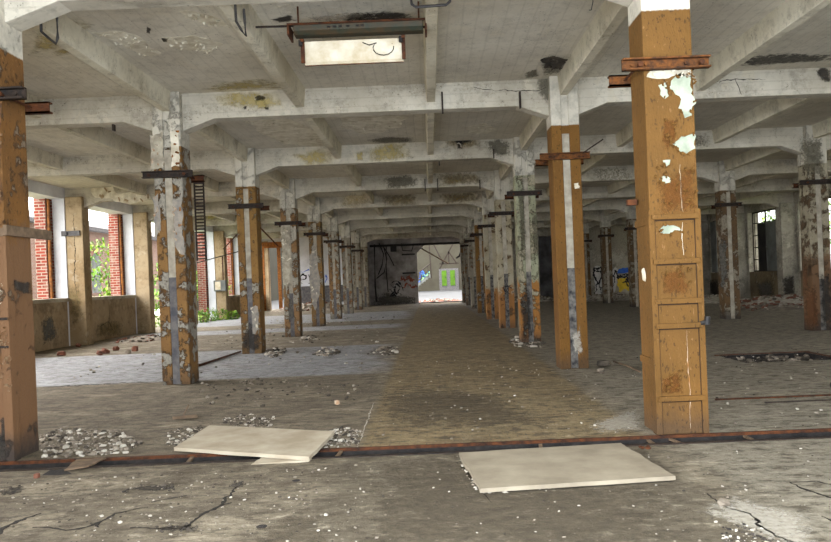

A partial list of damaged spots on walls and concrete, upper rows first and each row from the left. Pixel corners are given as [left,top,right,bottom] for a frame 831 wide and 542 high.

damp [742,53,830,82]
peeling [647,69,697,118]
peeling [150,130,180,171]
peeling [663,119,696,155]
peeling [654,160,698,211]
crack [0,486,238,534]
crack [707,493,793,542]
crack [789,481,831,521]